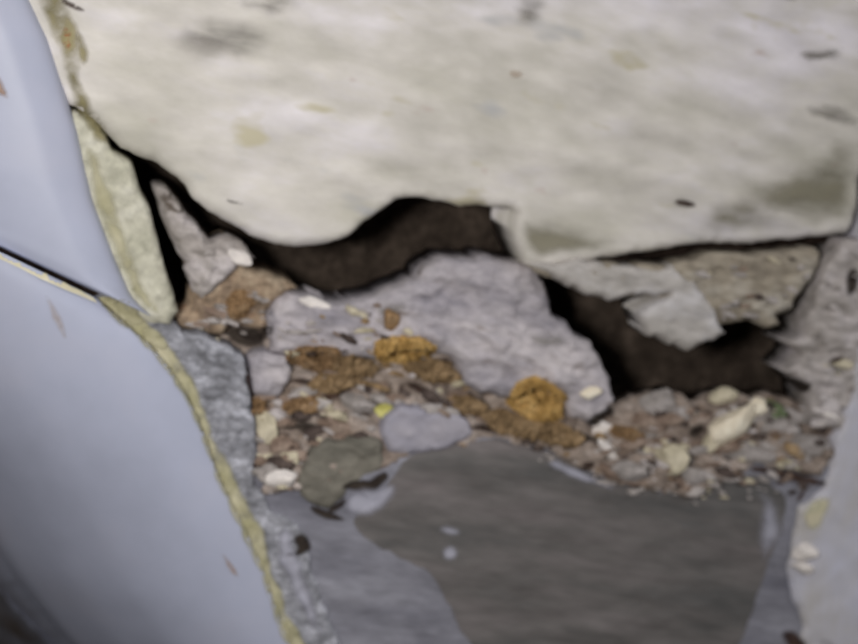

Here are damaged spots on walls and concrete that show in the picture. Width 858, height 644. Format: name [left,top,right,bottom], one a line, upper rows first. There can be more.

crack [0,247,100,296]
flaking render [106,133,858,430]
spalling [287,535,310,556]